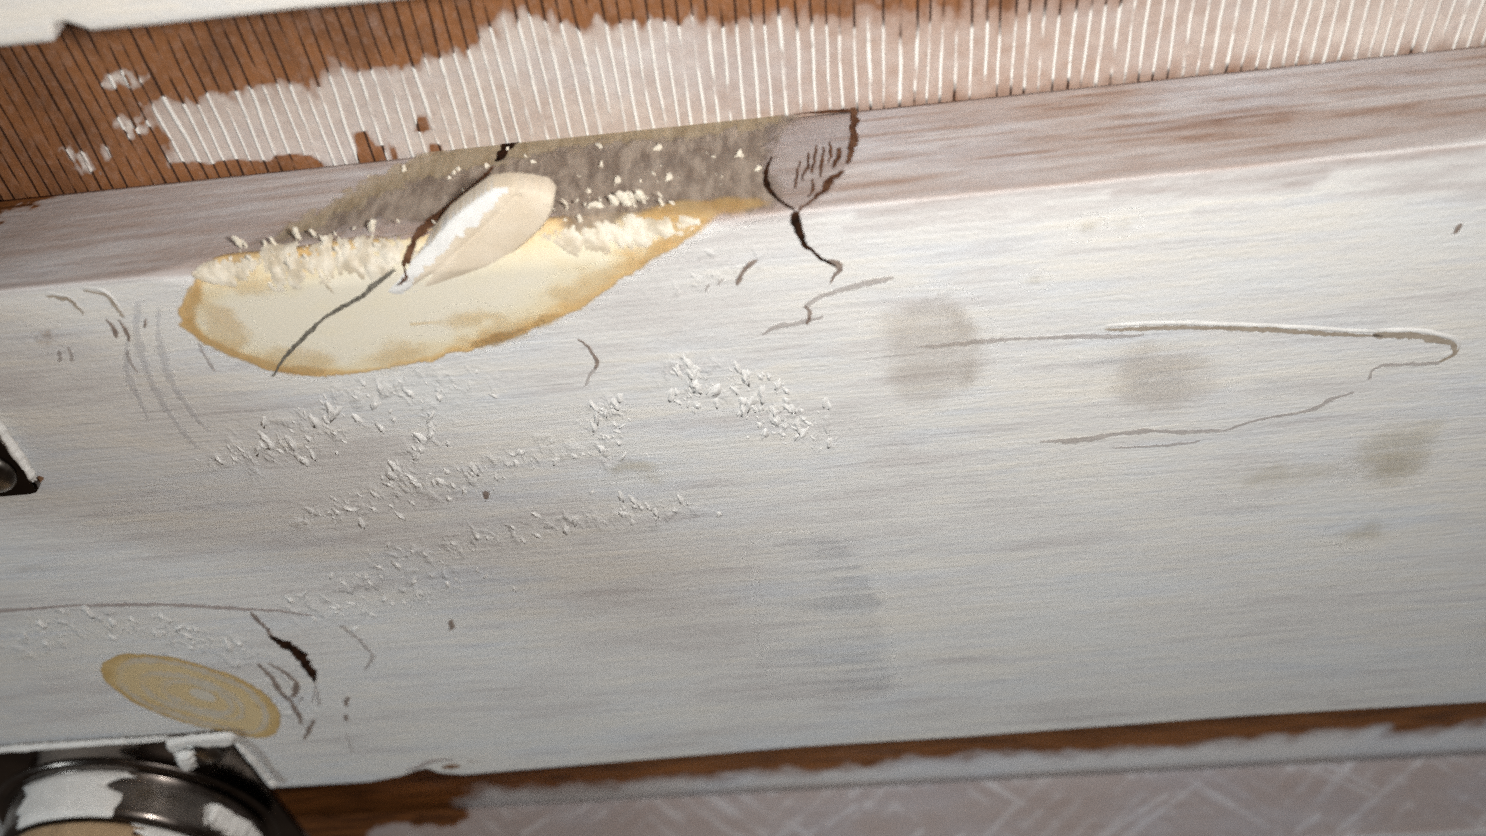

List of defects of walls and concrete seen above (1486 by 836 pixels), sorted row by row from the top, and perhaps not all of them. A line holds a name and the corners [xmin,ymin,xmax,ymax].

peeling [191,219,419,294]
peeling [541,142,700,257]
crack [763,107,860,325]
crack [1105,321,1461,362]
crack [250,613,350,740]